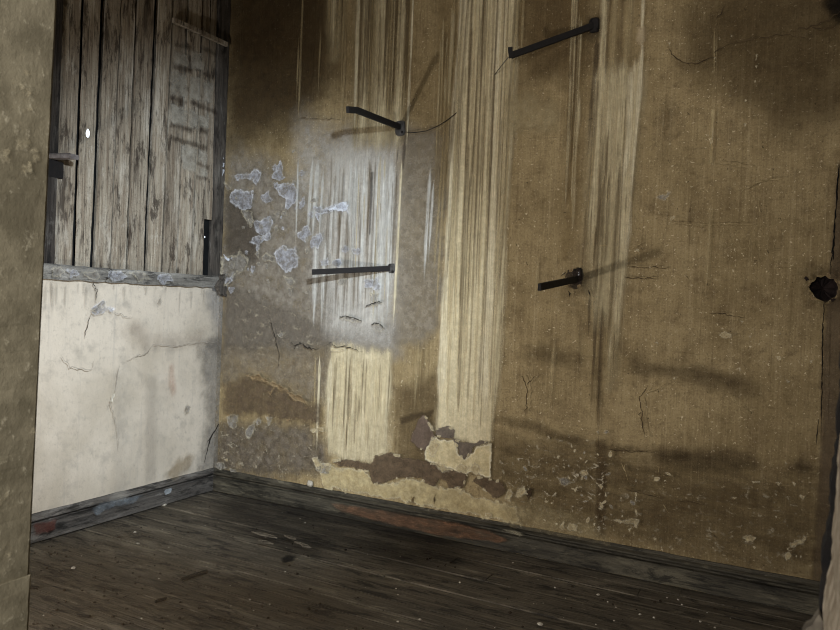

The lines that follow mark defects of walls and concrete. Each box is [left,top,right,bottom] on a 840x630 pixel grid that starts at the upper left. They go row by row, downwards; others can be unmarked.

peeling [214,158,348,297]
damp [199,0,523,475]
damp [588,0,644,376]
crack [830,167,839,274]
crack [270,319,362,366]
peeling [307,415,532,543]
peeling [537,445,612,529]
crack [609,388,659,471]
crack [816,305,825,444]